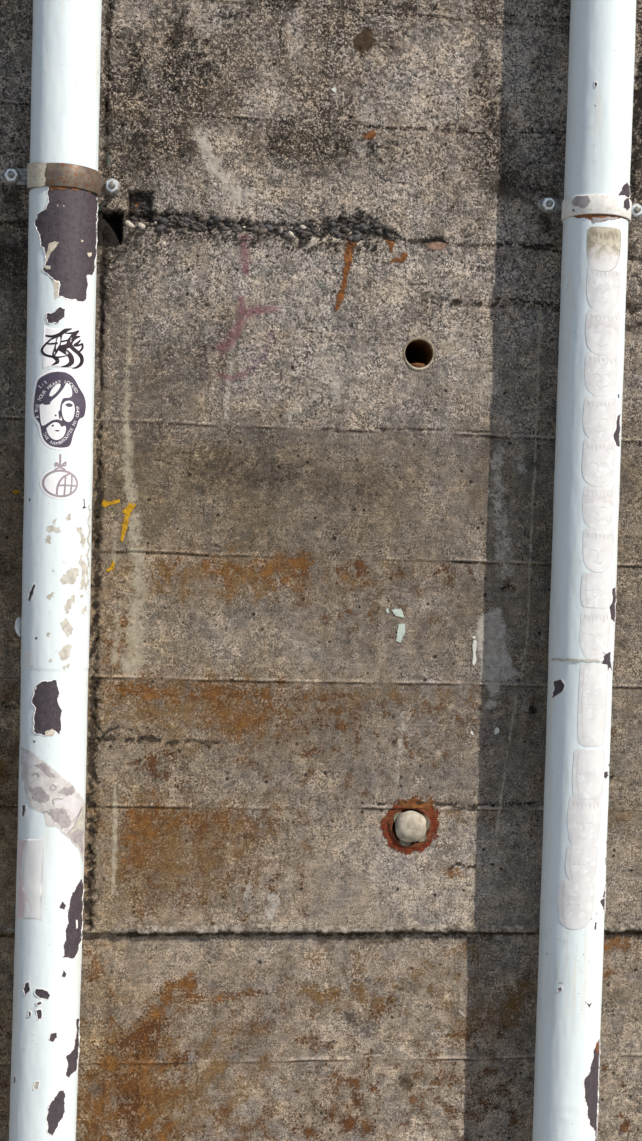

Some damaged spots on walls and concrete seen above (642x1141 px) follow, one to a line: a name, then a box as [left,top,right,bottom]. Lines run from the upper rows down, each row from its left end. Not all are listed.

damp [630,31,642,204]
corrosion [335,235,357,310]
damp [455,305,542,708]
corrosion [84,610,544,921]
corrosion [76,935,537,1141]